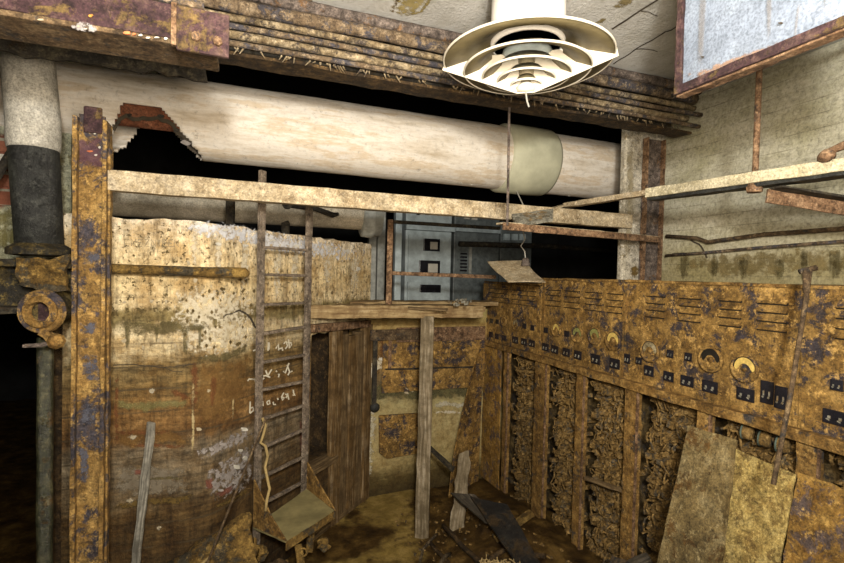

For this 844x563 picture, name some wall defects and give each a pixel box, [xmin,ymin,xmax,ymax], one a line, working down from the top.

leakage [392,0,431,15]
rust [79,133,102,167]
leakage [680,248,844,278]
leakage [124,321,204,351]
rust [83,355,99,380]